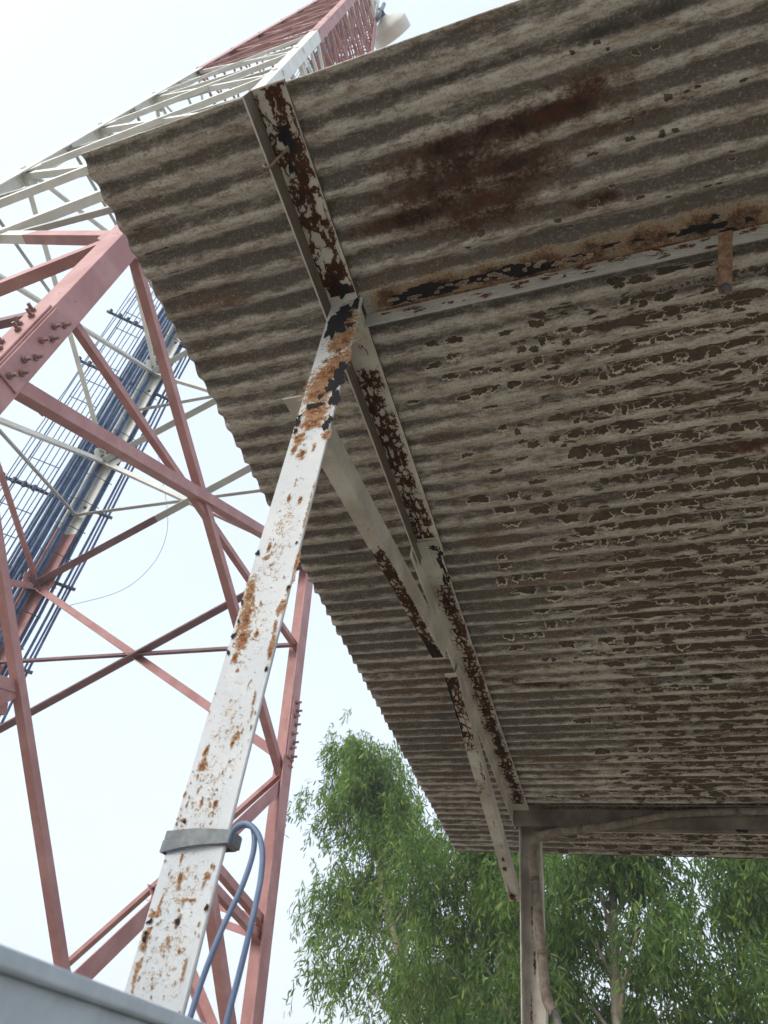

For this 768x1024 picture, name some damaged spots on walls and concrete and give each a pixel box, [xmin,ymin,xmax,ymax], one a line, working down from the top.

corrosion [254,62,768,804]
peeling [423,259,768,671]
peeling [574,710,757,770]
peeling [556,833,760,857]
corrosion [131,847,215,999]